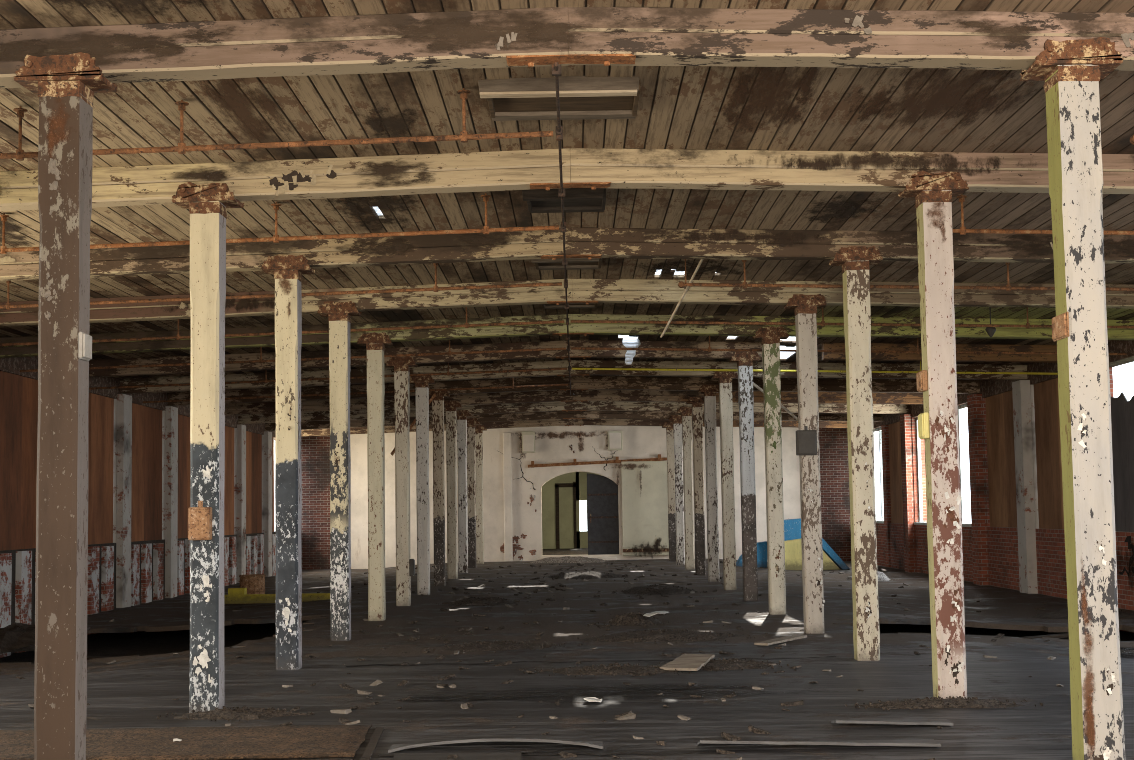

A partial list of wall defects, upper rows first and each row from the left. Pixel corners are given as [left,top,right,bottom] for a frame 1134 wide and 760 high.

damp [849,68,1032,129]
peeling [48,158,61,215]
damp [0,217,33,246]
peeling [40,273,56,320]
peeling [935,404,955,453]
peeling [1077,413,1087,448]
peeling [943,492,961,545]
peeling [200,575,212,602]
peeling [279,598,292,632]
peeling [950,589,961,622]
peeling [193,645,212,683]
peeling [945,645,964,684]